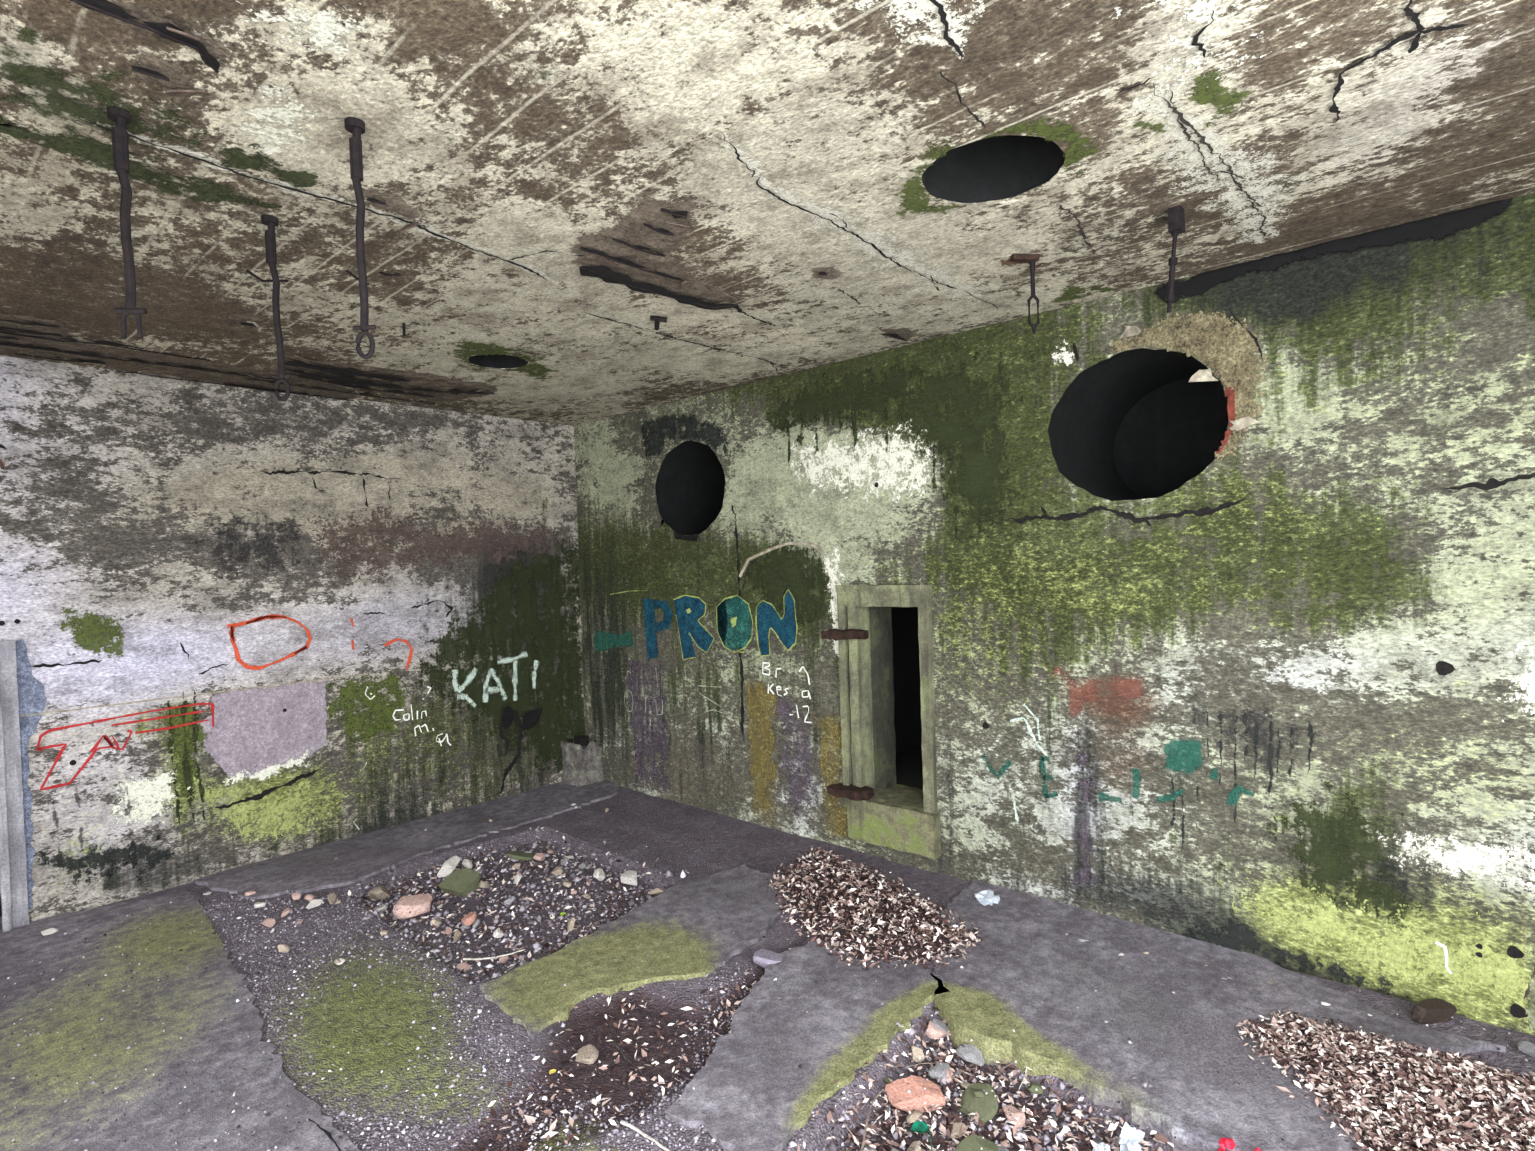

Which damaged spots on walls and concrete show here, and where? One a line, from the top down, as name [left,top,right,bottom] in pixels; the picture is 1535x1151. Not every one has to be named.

spalling [62,0,343,158]
peeling [237,1,378,65]
crack [855,0,985,127]
crack [1329,0,1469,123]
spalling [569,195,740,310]
spalling [0,313,498,404]
damp [762,352,1026,544]
crack [1005,498,1246,527]
crack [1442,473,1535,490]
damp [624,656,671,791]
damp [1170,695,1422,930]
damp [1168,900,1409,998]